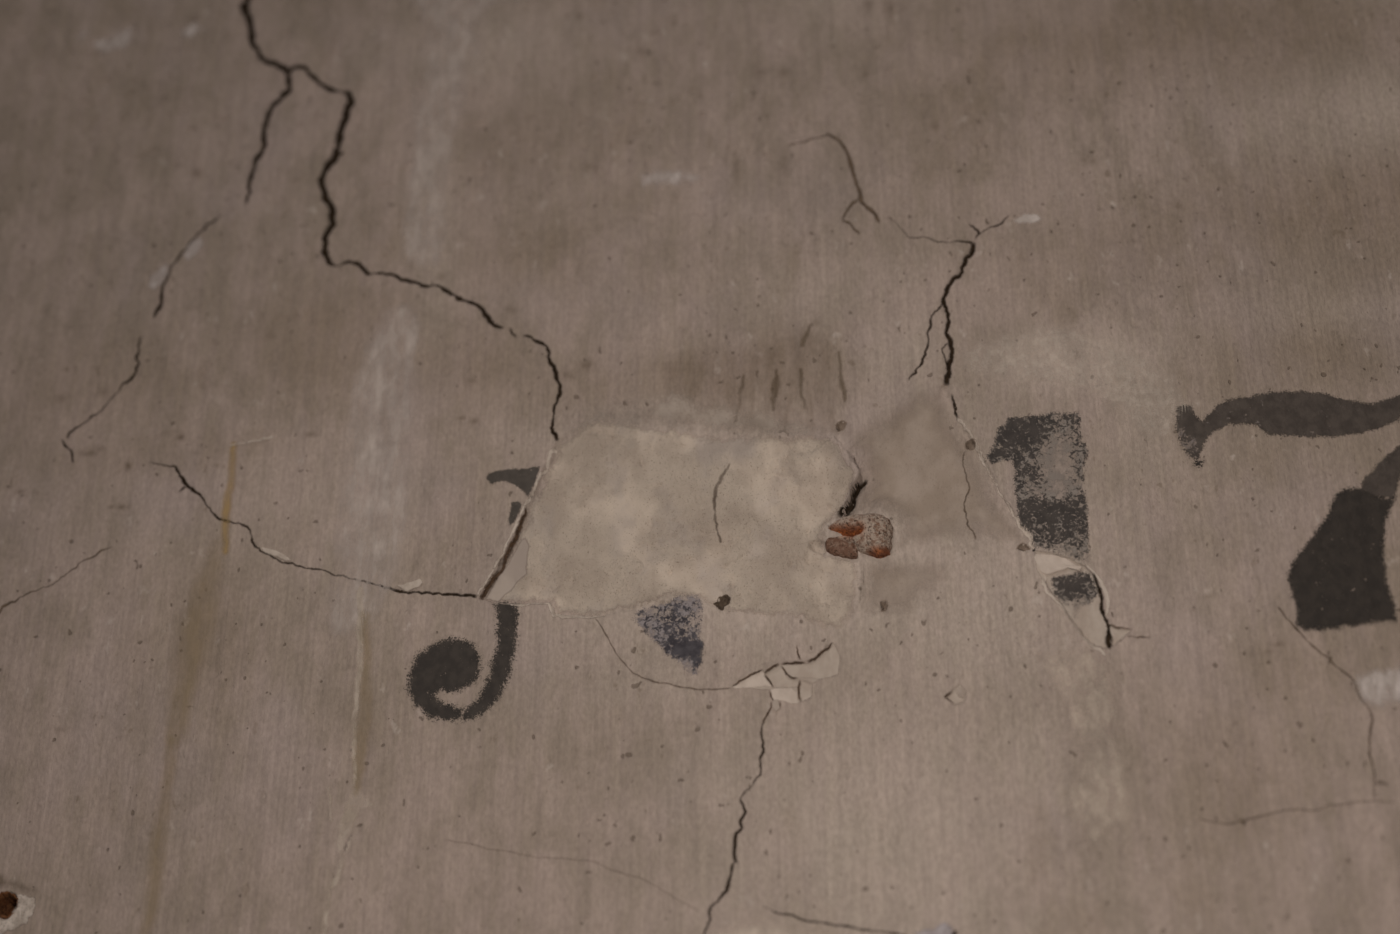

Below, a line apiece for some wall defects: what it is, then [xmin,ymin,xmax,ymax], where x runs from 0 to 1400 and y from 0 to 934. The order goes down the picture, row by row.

crack [62,0,562,461]
crack [790,134,879,233]
crack [909,219,1005,416]
crack [165,465,476,598]
spalling [477,398,1144,656]
peeling [733,643,840,721]
crack [704,712,769,934]
spalling [0,894,35,934]
crack [774,911,899,934]